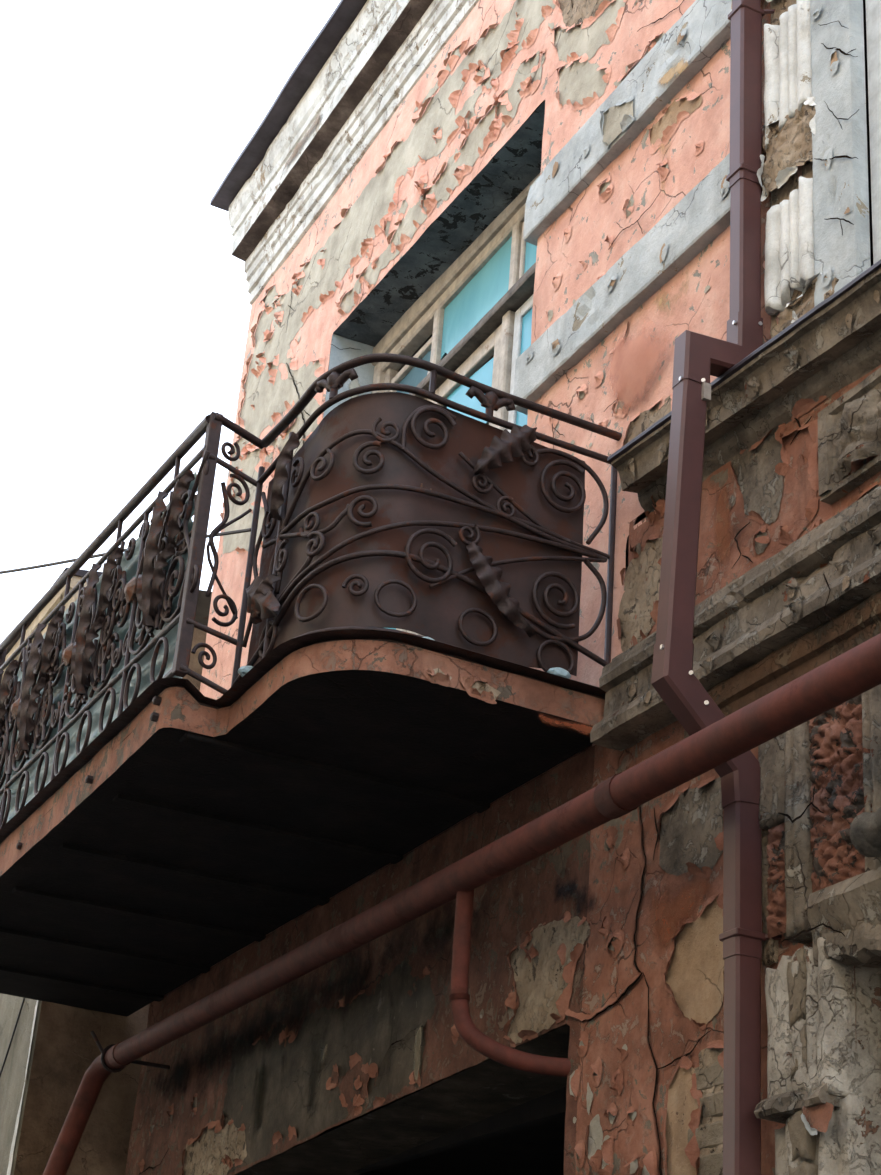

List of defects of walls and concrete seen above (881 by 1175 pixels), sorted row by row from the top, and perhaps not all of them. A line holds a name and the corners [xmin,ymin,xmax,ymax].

crack [637,0,684,32]
spalling [649,92,702,182]
spalling [757,97,832,201]
peeling [220,0,686,554]
crack [285,363,309,456]
spalling [728,419,881,556]
spalling [617,495,665,652]
spalling [182,960,435,1175]
water stain [414,1026,422,1082]
peeling [503,911,590,1047]
crack [565,807,711,1175]
peeling [569,886,724,1175]